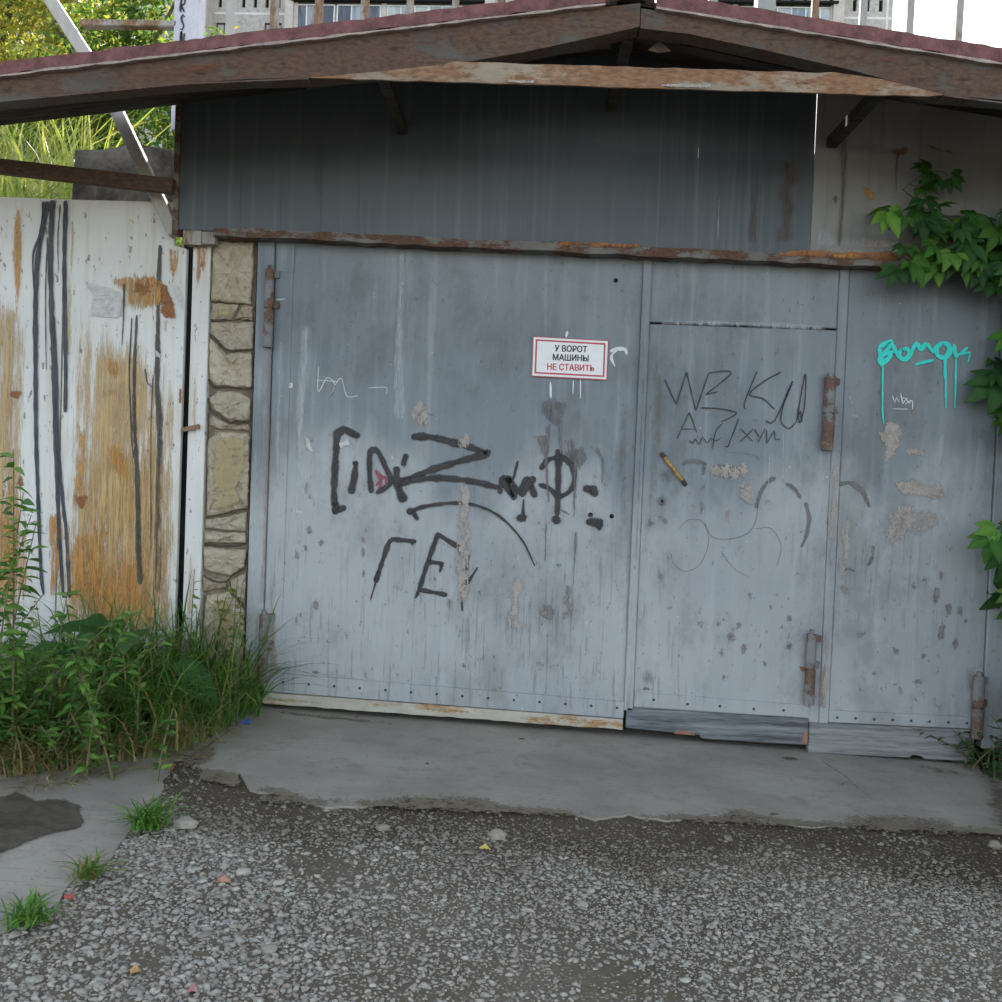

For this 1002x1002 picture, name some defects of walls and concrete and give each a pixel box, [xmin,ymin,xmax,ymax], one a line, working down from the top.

corrosion [114,274,175,331]
corrosion [196,248,207,287]
corrosion [46,310,182,632]
peeling [878,421,926,466]
peeling [448,483,472,609]
peeling [564,532,577,614]
peeling [880,478,948,548]